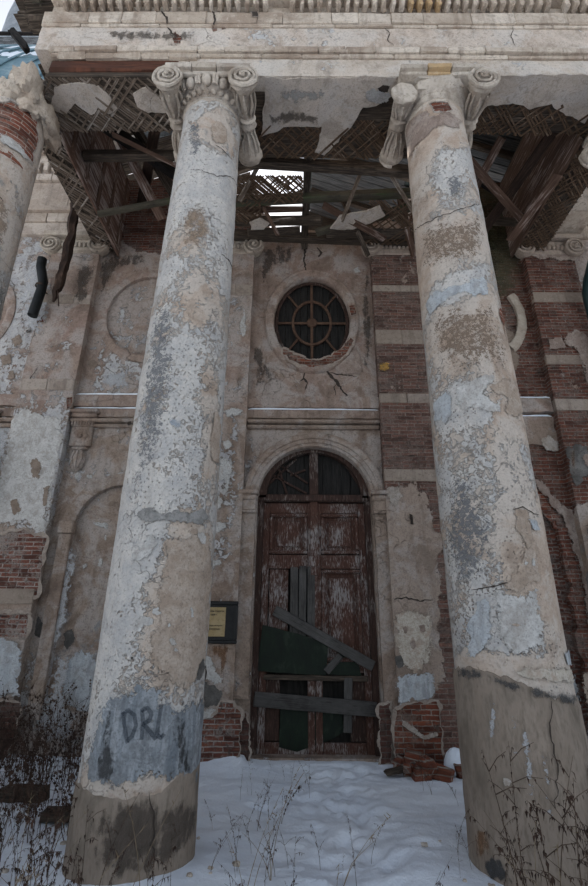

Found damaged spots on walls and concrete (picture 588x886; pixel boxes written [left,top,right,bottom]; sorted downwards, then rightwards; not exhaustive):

flaking render [0,101,39,169]
crack [326,371,357,396]
peeling [426,277,523,423]
flaking render [549,330,588,385]
peeling [0,405,64,600]
peeling [0,609,43,698]
peeling [62,507,252,788]